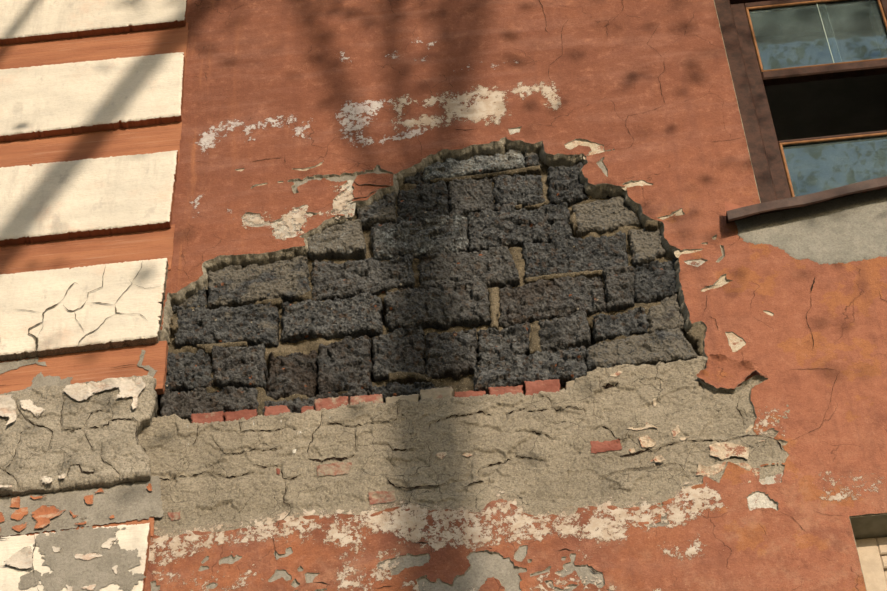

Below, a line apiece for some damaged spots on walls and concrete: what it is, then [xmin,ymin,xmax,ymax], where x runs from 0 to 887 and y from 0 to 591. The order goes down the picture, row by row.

crack [28,264,159,351]
flaking render [0,140,790,591]
crack [0,385,145,484]
crack [159,408,398,561]
crack [387,444,543,489]
crack [429,396,578,440]
crack [595,368,840,490]